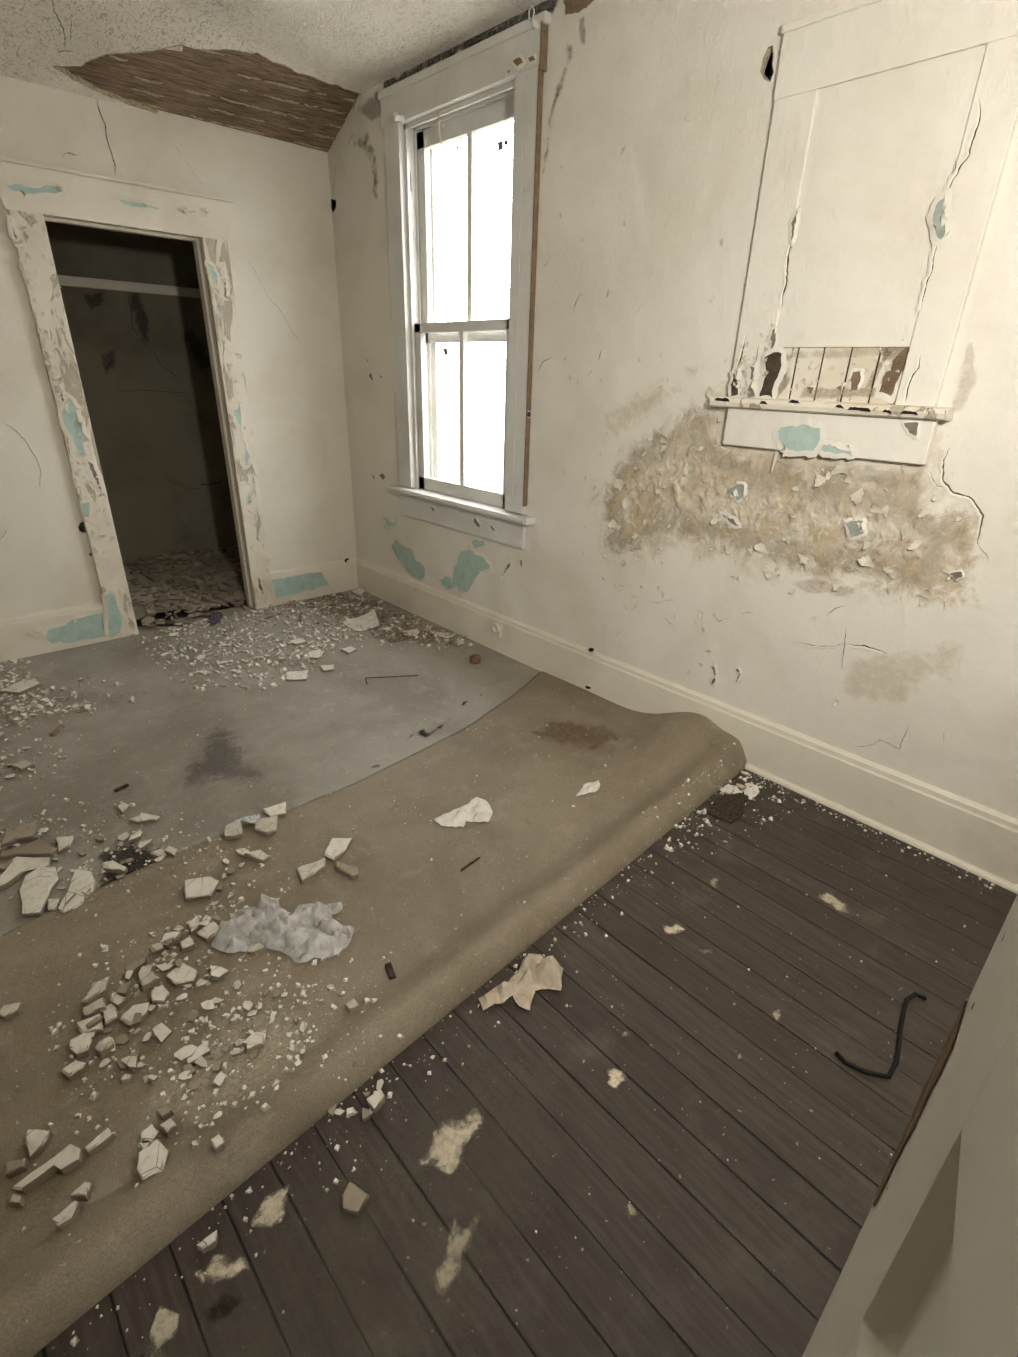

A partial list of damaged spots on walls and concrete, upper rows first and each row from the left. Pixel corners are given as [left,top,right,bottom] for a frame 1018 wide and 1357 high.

flaking render [560,0,609,21]
crack [942,100,981,191]
peeling [788,207,802,248]
peeling [204,260,234,320]
crack [915,245,937,311]
peeling [715,324,922,460]
crack [900,354,920,405]
peeling [228,363,332,601]
peeling [390,516,524,599]
peeling [719,481,749,529]
peeling [842,517,868,540]
peeling [43,590,127,647]